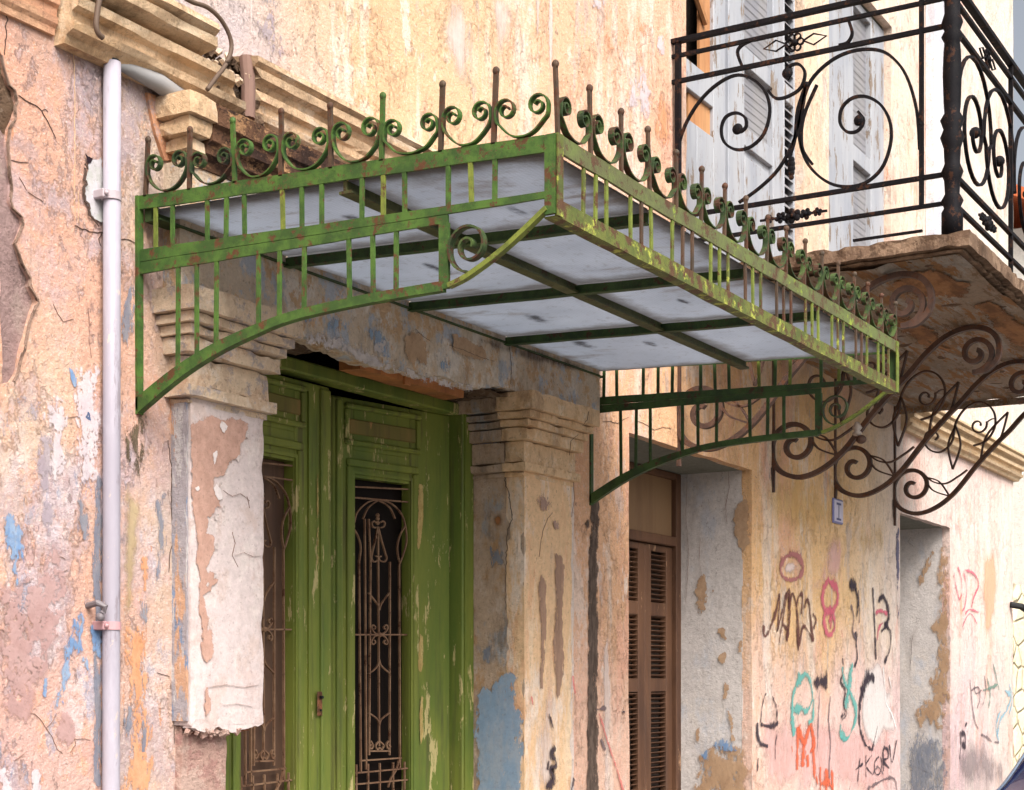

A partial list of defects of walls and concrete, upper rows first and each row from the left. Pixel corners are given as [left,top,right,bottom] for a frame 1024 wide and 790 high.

flaking render [0,55,40,384]
flaking render [82,153,103,227]
flaking render [0,513,102,746]
peeling [182,415,250,740]
crack [500,472,513,609]
leakage [539,553,565,699]
peeling [695,574,714,613]
peeling [717,627,742,664]
flaking render [915,547,950,729]
peeling [473,672,524,790]